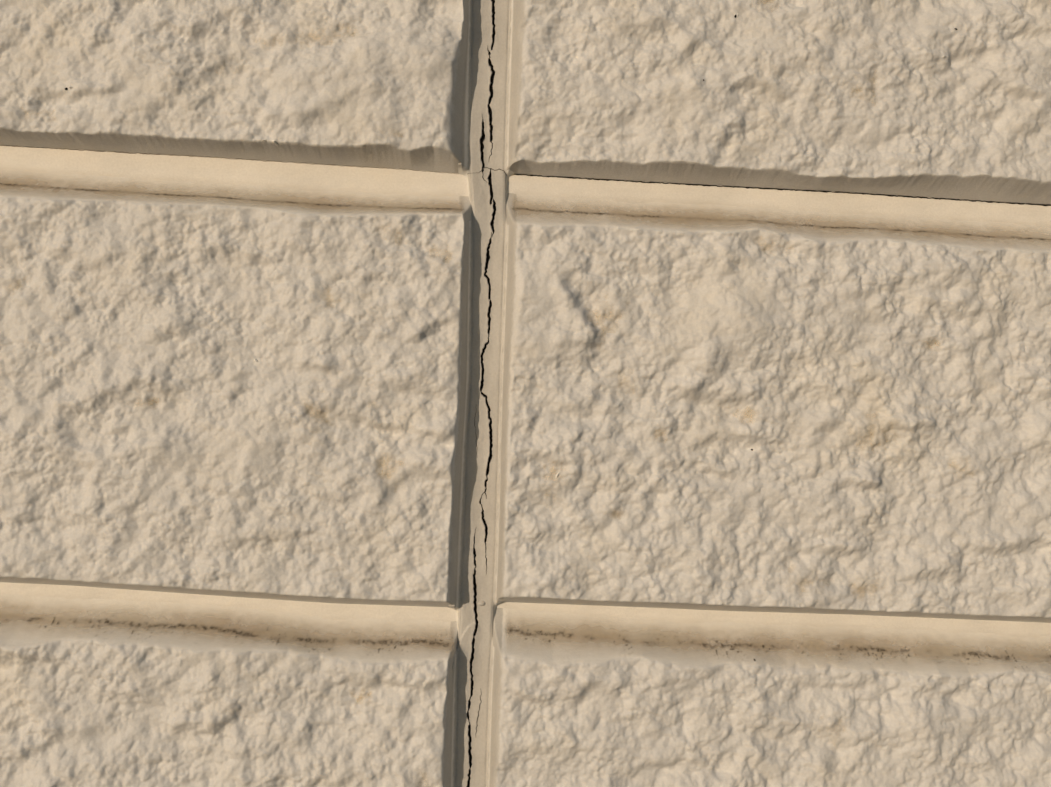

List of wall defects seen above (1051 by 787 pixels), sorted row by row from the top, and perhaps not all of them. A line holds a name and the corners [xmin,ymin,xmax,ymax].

crack [369,0,1051,787]